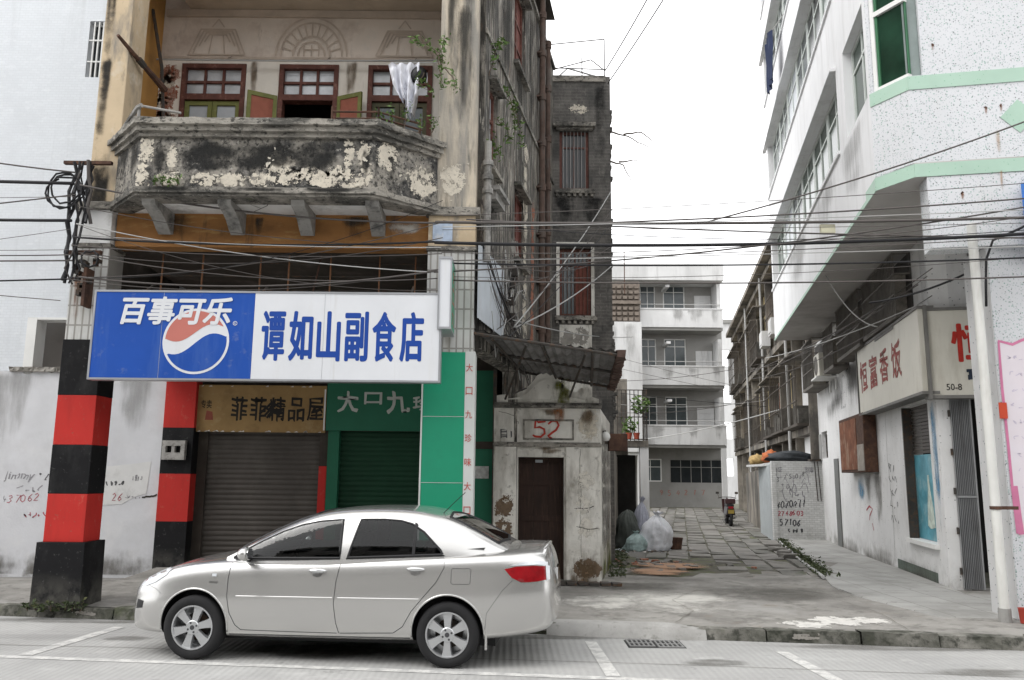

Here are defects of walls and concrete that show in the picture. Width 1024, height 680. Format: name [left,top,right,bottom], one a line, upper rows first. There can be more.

damp [448,0,471,100]
damp [97,59,111,130]
damp [91,167,108,201]
damp [121,145,136,174]
mould [155,151,165,168]
mould [187,143,335,169]
peeling [135,138,469,201]